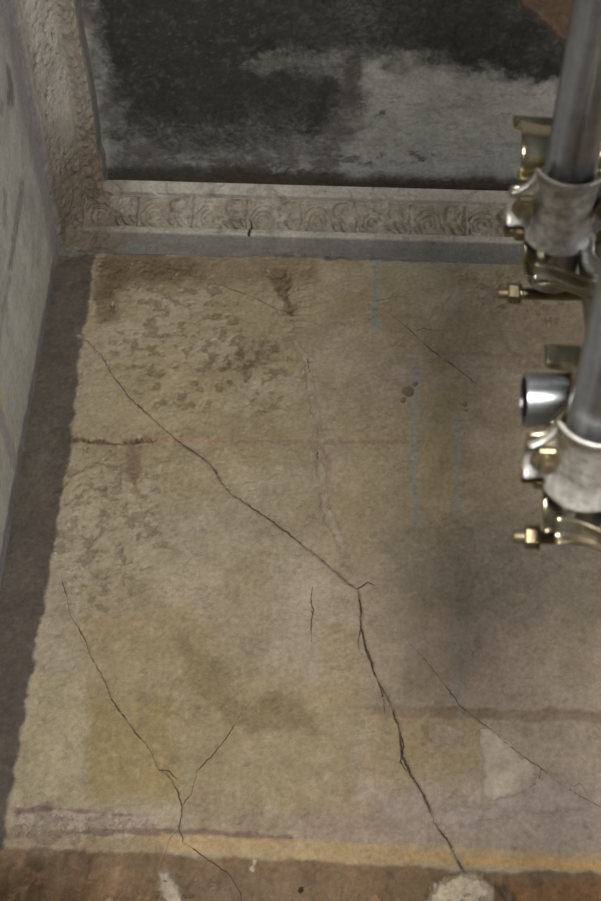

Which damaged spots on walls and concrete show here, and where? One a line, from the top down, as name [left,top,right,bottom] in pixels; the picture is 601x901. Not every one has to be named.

leakage [107,155,528,191]
crack [79,335,150,416]
crack [174,438,470,877]
crack [161,769,242,901]
flaking render [159,872,182,901]
flaking render [427,871,512,901]